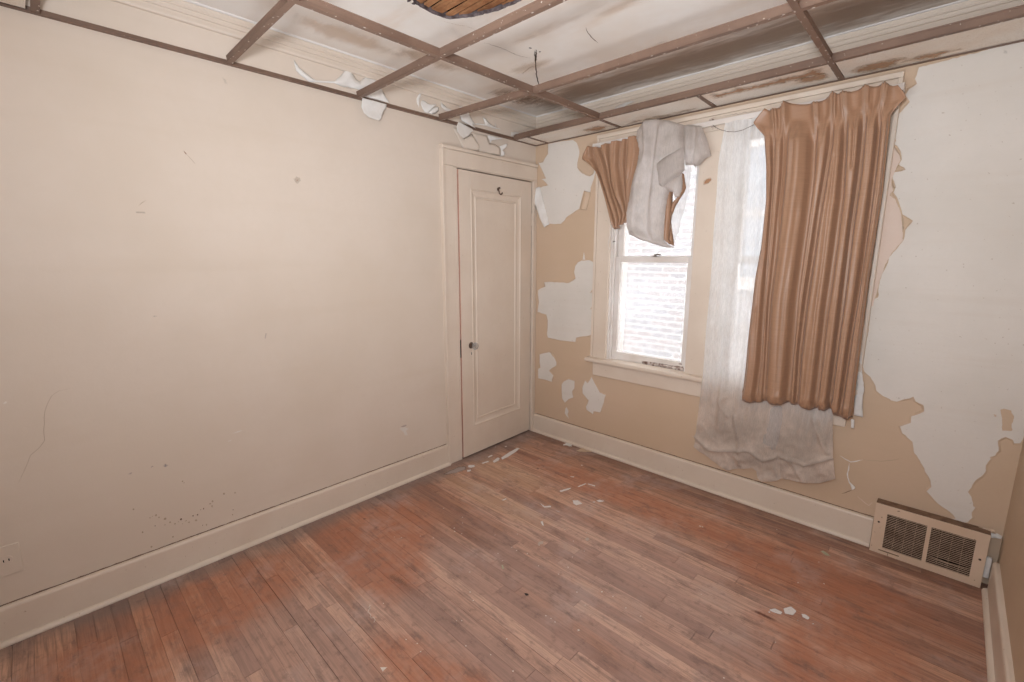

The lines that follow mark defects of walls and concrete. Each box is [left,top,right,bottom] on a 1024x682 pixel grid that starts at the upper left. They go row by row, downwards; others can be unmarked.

flaking render [535,139,596,227]
flaking render [537,252,606,419]
flaking render [862,42,1024,524]